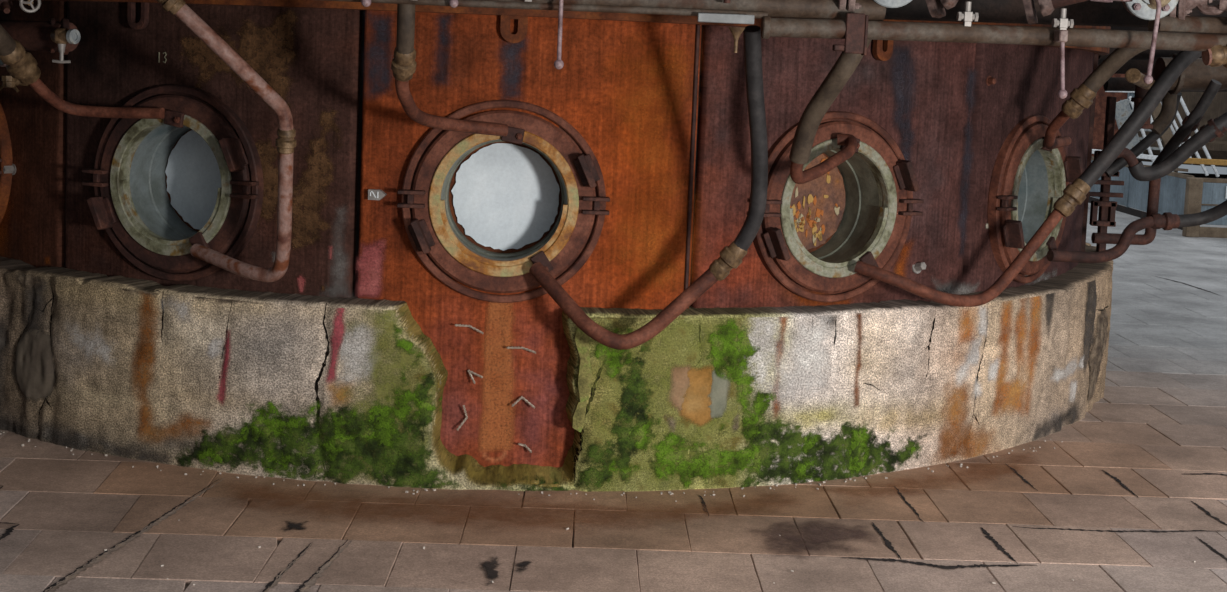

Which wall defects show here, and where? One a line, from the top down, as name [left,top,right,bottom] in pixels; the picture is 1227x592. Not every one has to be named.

corrosion [133,295,203,436]
crack [314,302,330,479]
water stain [342,328,369,380]
spalling [398,305,592,487]
crack [574,349,610,483]
water stain [747,317,775,385]
water stain [783,315,835,394]
corrosion [961,313,972,340]
corrosion [995,296,1041,411]
water stain [1034,280,1097,441]